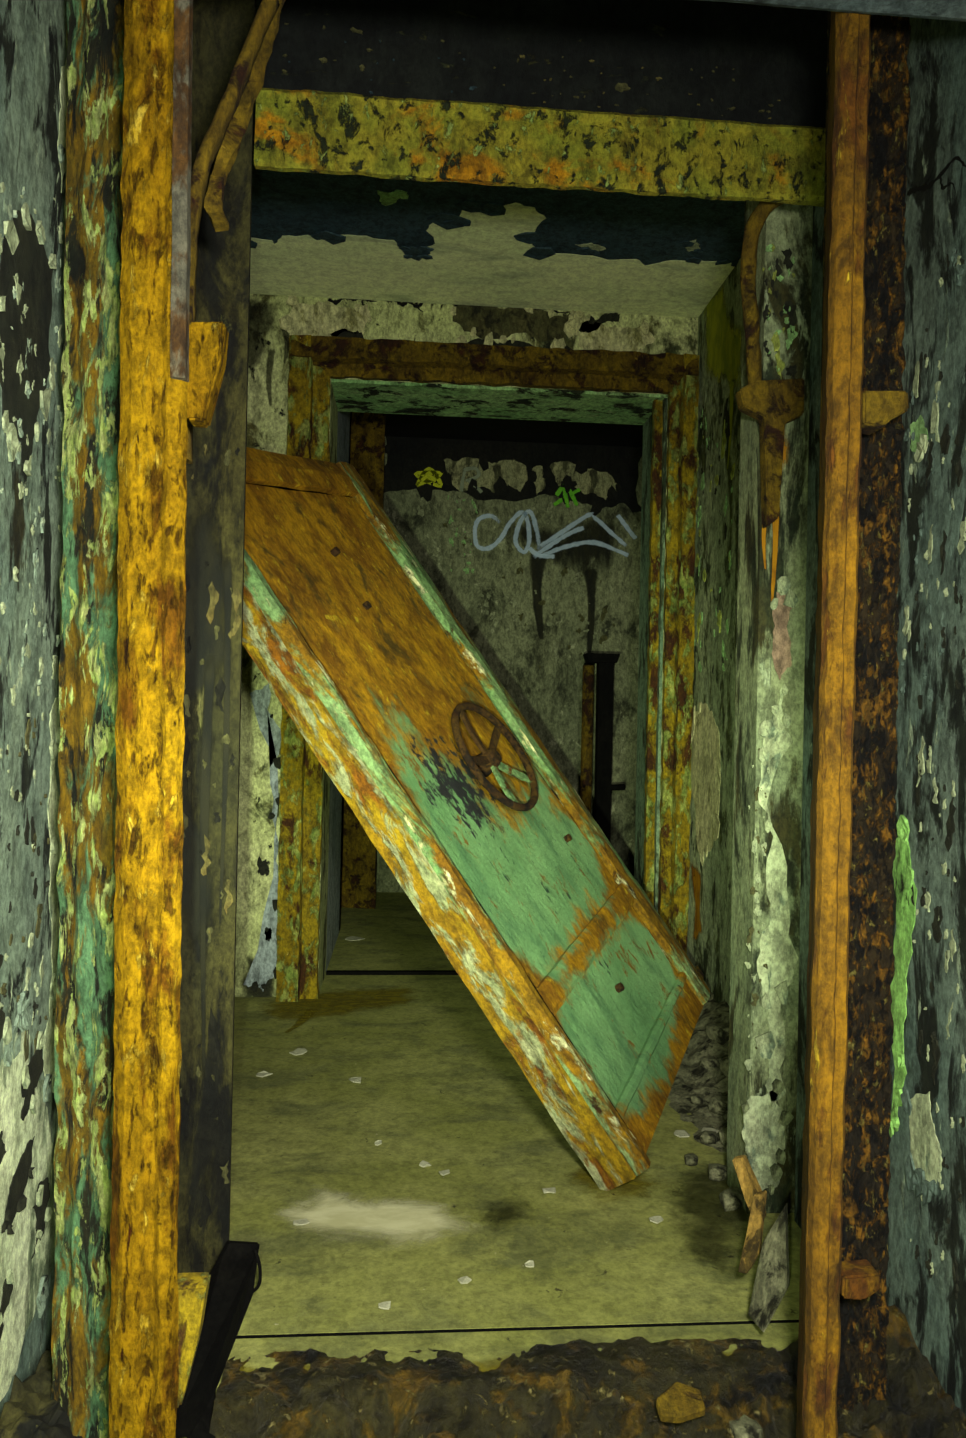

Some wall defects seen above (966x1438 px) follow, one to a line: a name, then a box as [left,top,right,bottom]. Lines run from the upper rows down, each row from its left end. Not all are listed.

peeling [377,190,409,206]
peeling [250,200,739,353]
peeling [939,247,965,287]
peeling [384,436,643,574]
damp [508,521,615,653]
peeling [534,567,615,670]
peeling [900,352,966,710]
peeling [0,182,65,1402]
peeling [889,736,965,1205]
peeling [910,1217,960,1299]